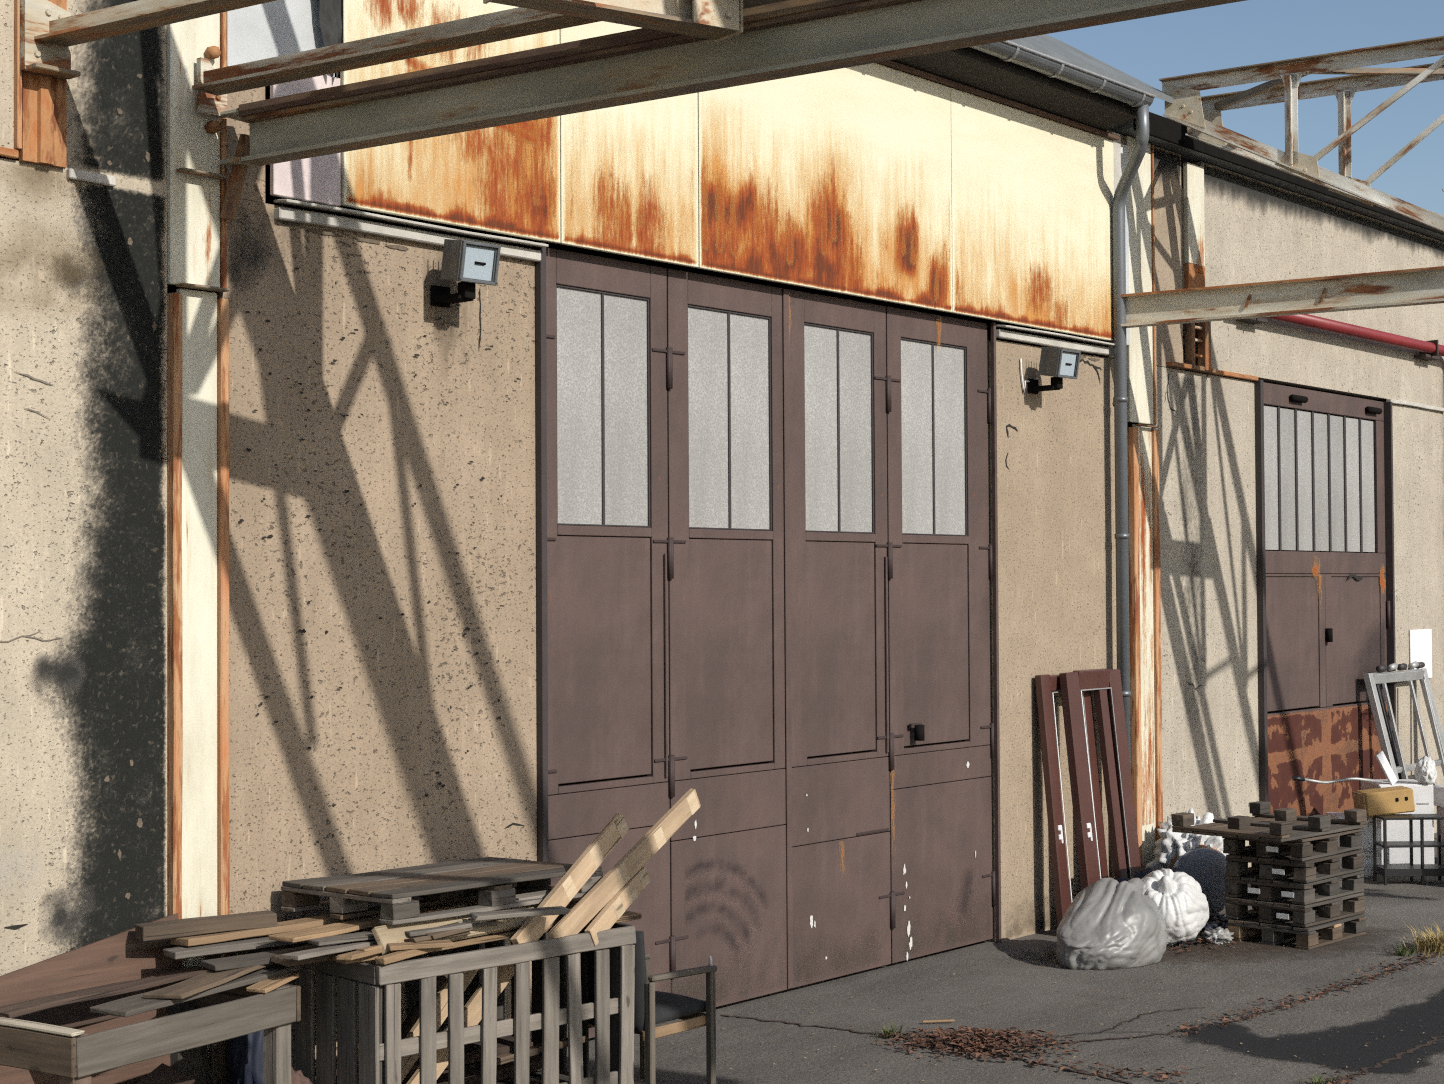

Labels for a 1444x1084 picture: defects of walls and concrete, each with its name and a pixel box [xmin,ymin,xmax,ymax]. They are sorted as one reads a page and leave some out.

rust [395,44,482,75]
rust [348,117,1113,345]
rust [1139,457,1152,614]
rust [1141,701,1155,825]